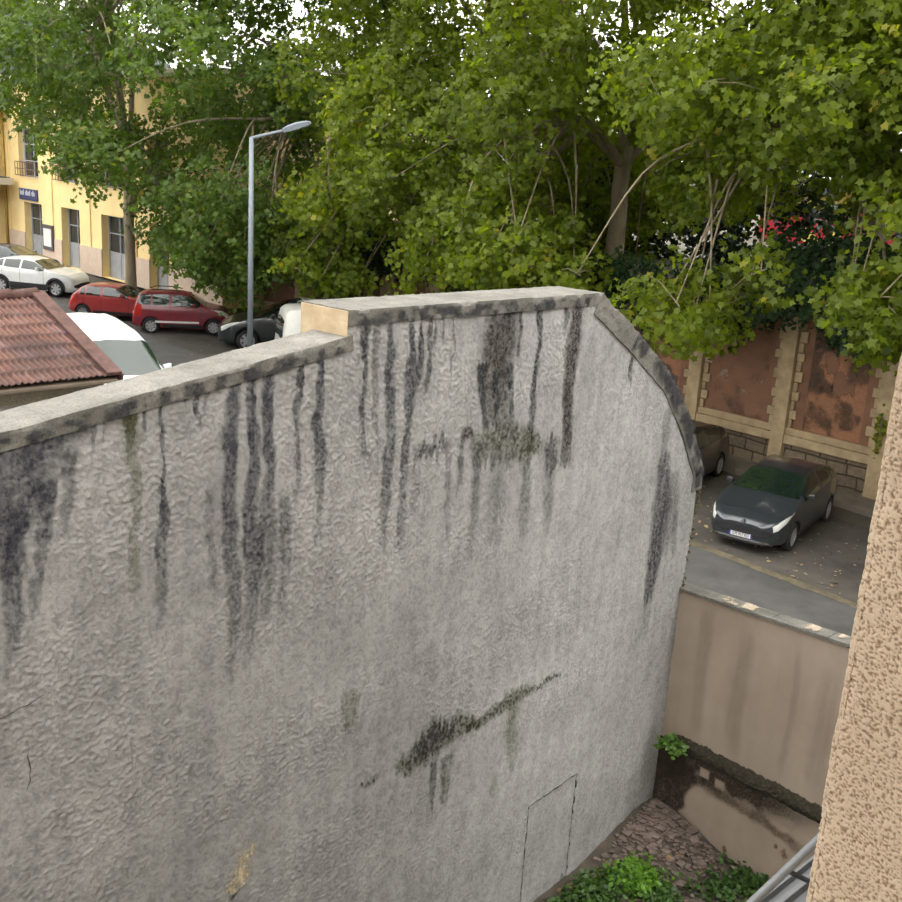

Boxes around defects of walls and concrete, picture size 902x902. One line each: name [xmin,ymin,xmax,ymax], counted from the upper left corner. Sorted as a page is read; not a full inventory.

leakage [0,430,81,636]
leakage [223,374,290,605]
leakage [294,365,305,422]
leakage [311,361,327,491]
leakage [359,317,455,490]
leakage [477,364,500,424]
leakage [529,310,543,433]
leakage [548,307,583,485]
leakage [646,466,675,602]
leakage [467,674,558,737]
leakage [652,735,794,845]